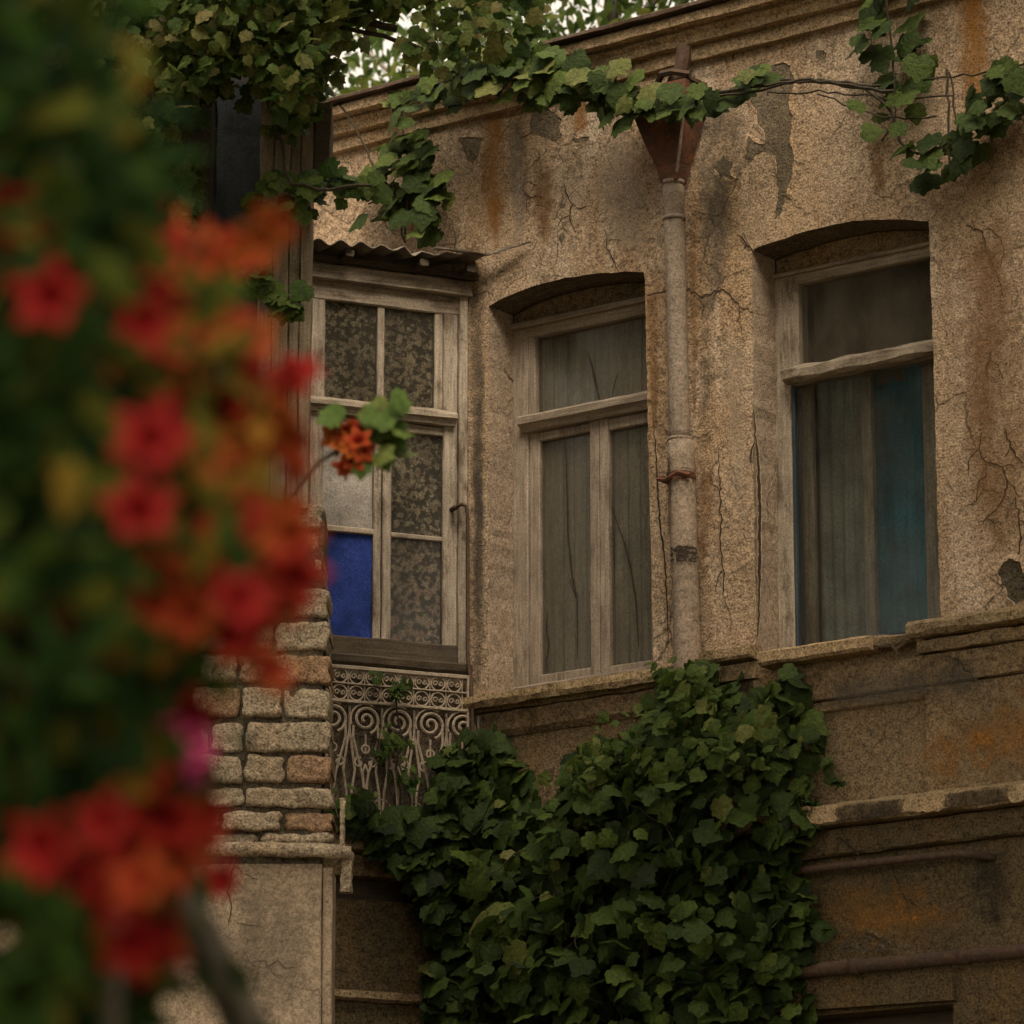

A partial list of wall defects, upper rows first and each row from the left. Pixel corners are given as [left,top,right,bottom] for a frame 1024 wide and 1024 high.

flaking render [454,132,488,173]
crack [509,132,589,231]
flaking render [707,58,799,218]
crack [646,287,774,329]
crack [966,225,1004,304]
crack [985,351,1003,379]
crack [652,417,669,645]
rust [666,442,696,534]
crack [710,448,732,630]
crack [749,409,777,636]
crack [968,428,1024,555]
flaking render [992,554,1024,607]